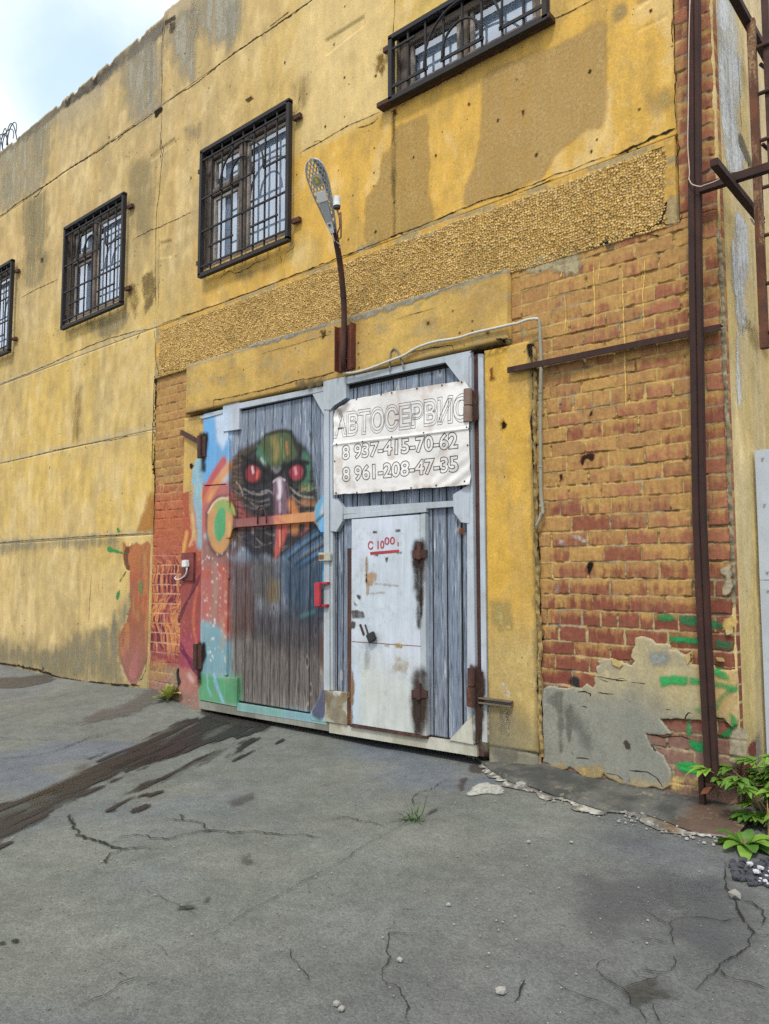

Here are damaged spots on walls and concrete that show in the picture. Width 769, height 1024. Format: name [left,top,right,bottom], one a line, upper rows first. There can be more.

crack [0,0,682,543]
spalling [716,230,736,604]
corrosion [412,540,425,625]
peeling [527,343,702,791]
spalling [723,617,738,635]
corrosion [411,670,427,734]
peeling [714,657,756,777]
water stain [0,716,272,848]
spalling [466,755,726,837]
crack [561,970,661,1022]